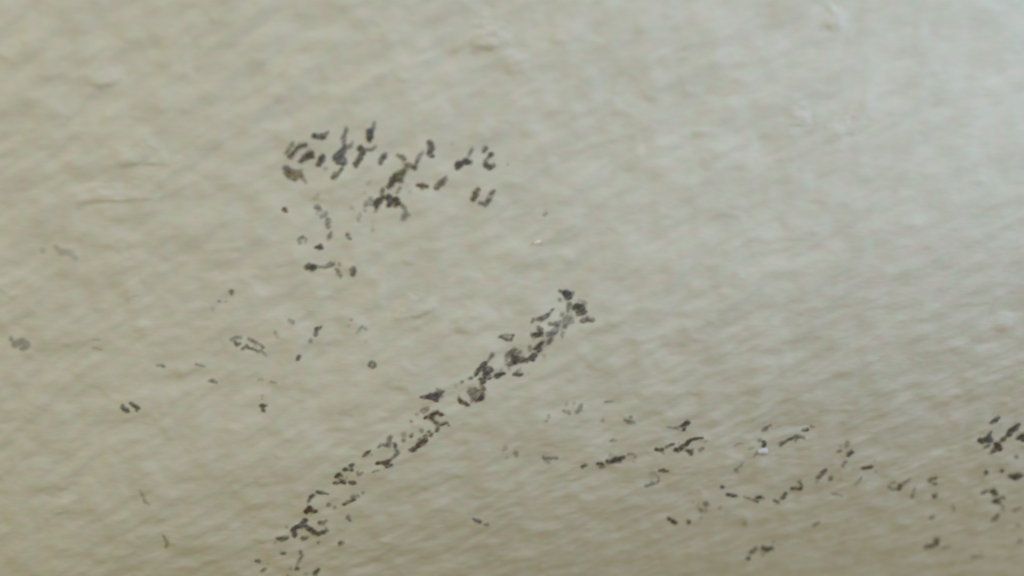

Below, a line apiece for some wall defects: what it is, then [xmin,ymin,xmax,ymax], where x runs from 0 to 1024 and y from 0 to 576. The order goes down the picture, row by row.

damp [287,132,328,157]
damp [353,145,373,167]
damp [420,393,449,426]
damp [679,437,703,456]